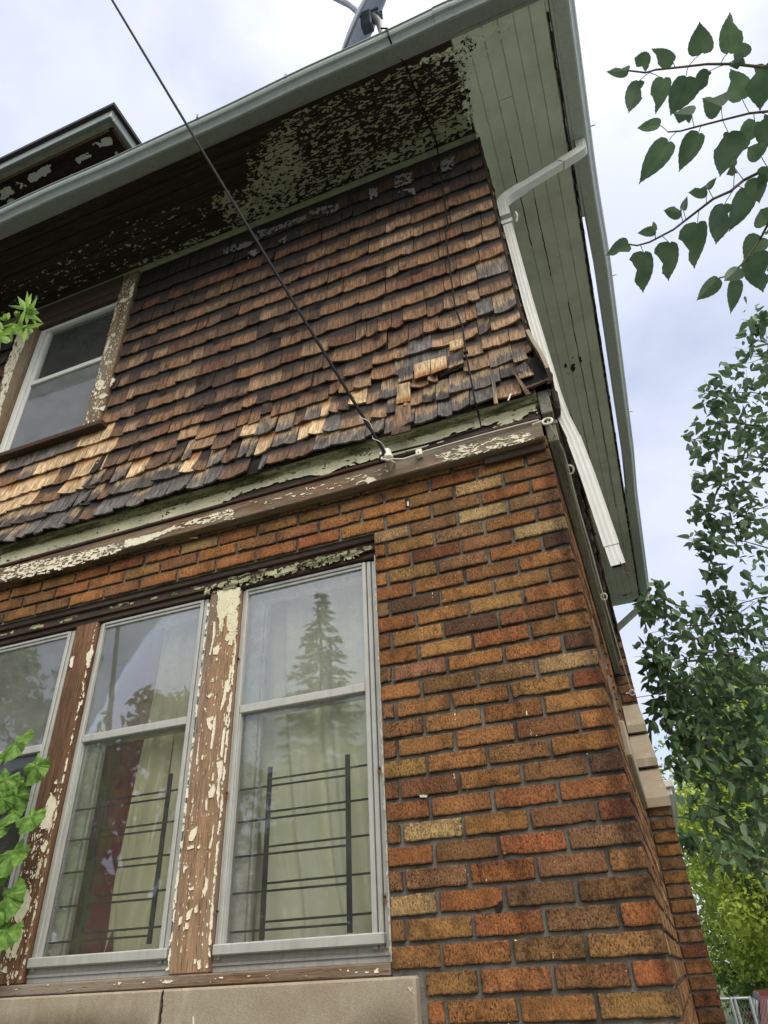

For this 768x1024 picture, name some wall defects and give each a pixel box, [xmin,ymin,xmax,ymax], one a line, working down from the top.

peeling [0,13,517,425]
peeling [0,404,539,582]
peeling [0,758,68,990]
peeling [69,648,94,712]
peeling [160,545,372,984]
crack [157,990,165,1024]